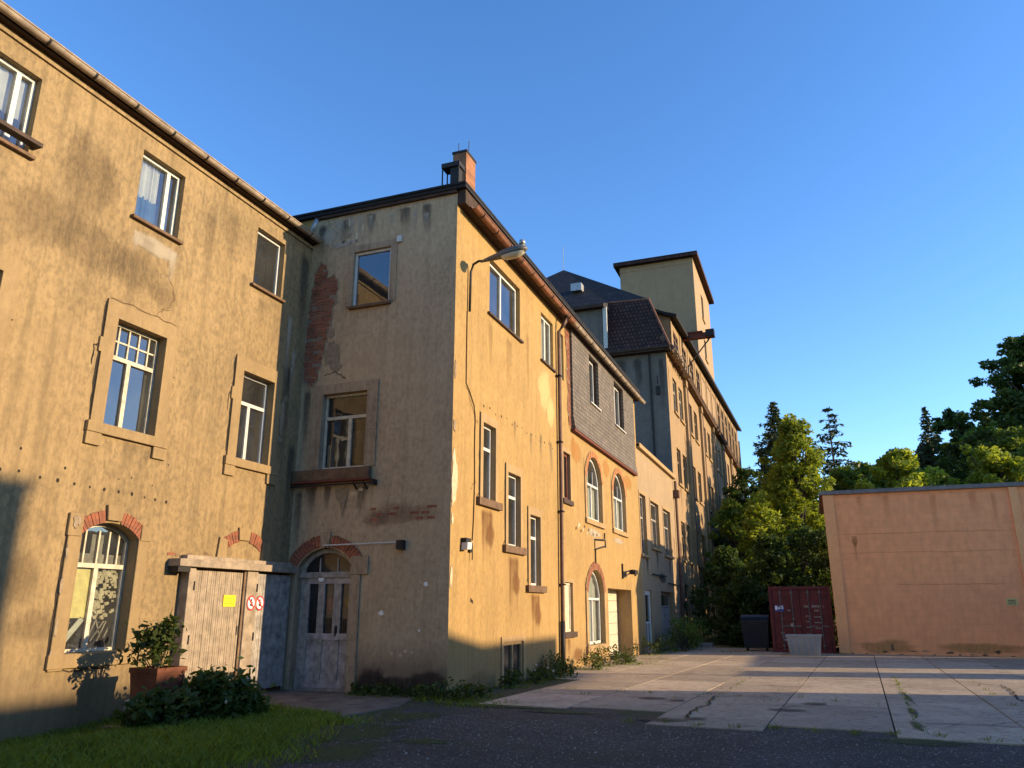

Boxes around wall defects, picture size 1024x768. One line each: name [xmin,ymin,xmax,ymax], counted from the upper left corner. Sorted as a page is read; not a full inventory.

crack [89,251,180,415]
flaking render [302,260,342,388]